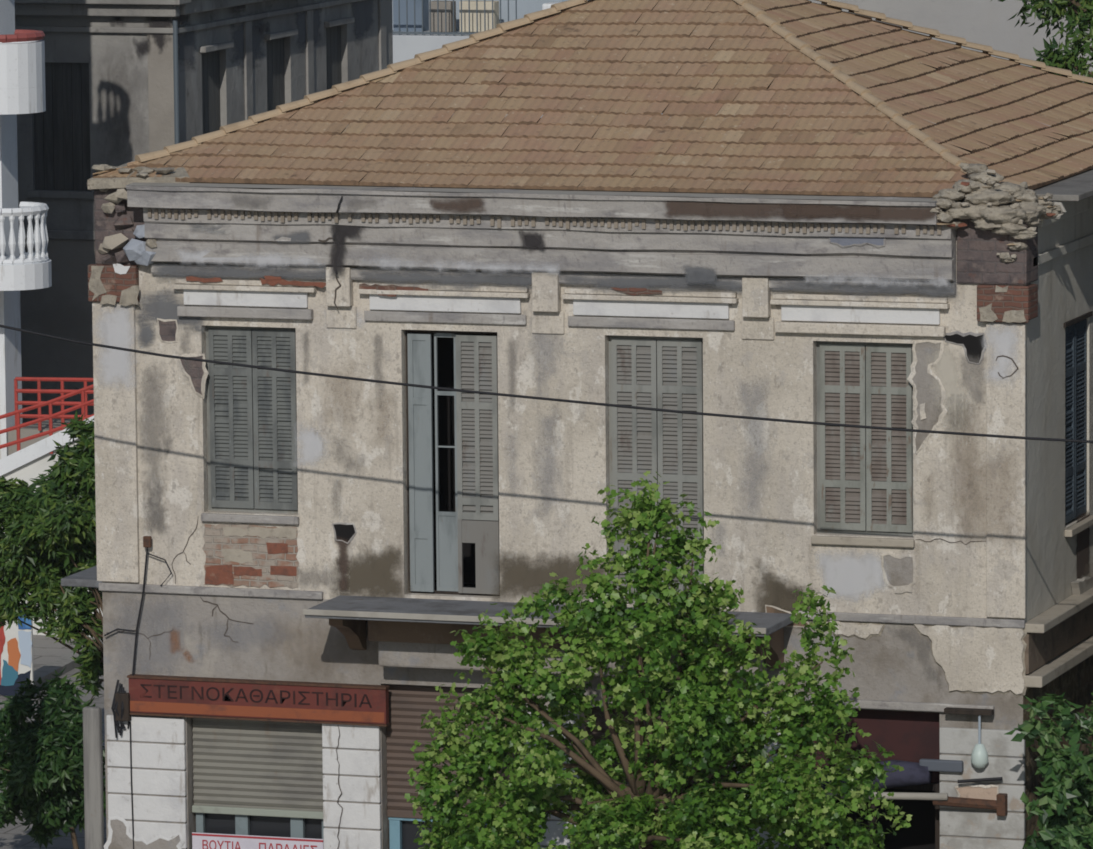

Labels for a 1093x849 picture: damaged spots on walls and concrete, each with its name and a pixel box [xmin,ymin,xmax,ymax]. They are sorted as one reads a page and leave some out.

spalling [87,160,190,306]
flaking render [157,318,208,399]
flaking render [907,284,1038,455]
crack [172,520,198,584]
flaking render [202,524,299,589]
damp [335,549,402,597]
damp [498,557,608,597]
flaking render [881,550,918,594]
crack [200,597,253,642]
flaking render [822,620,886,640]
flaking render [912,624,1027,697]
flaking render [104,816,185,849]